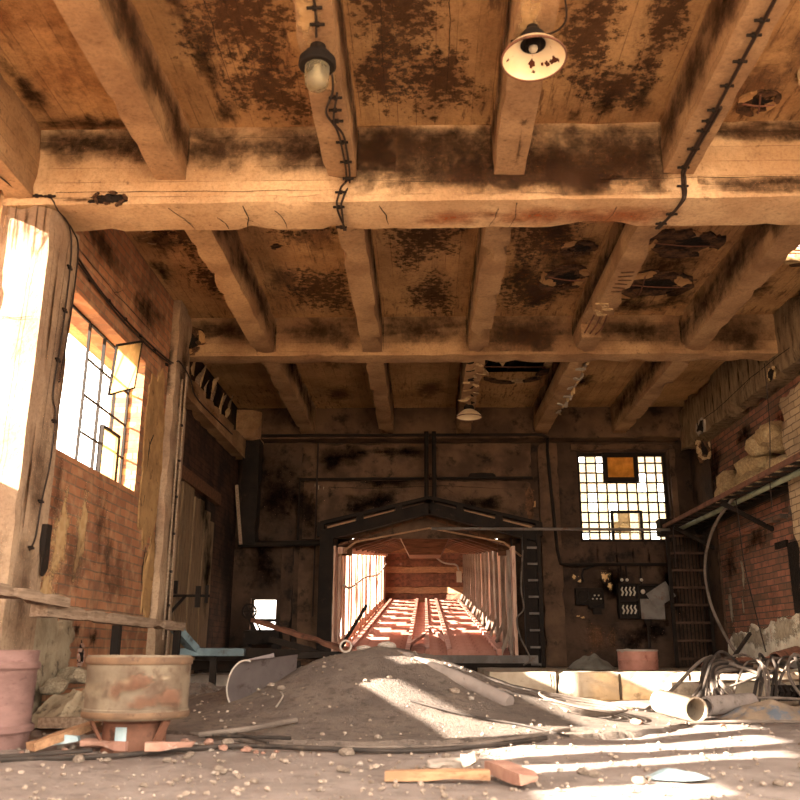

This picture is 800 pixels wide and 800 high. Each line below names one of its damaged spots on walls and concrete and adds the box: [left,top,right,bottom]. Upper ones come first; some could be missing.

damp [165,0,315,125]
damp [347,0,489,122]
damp [550,0,691,120]
spalling [735,90,782,117]
damp [381,228,465,316]
spalling [537,240,601,291]
spalling [611,270,697,299]
spalling [648,228,732,259]